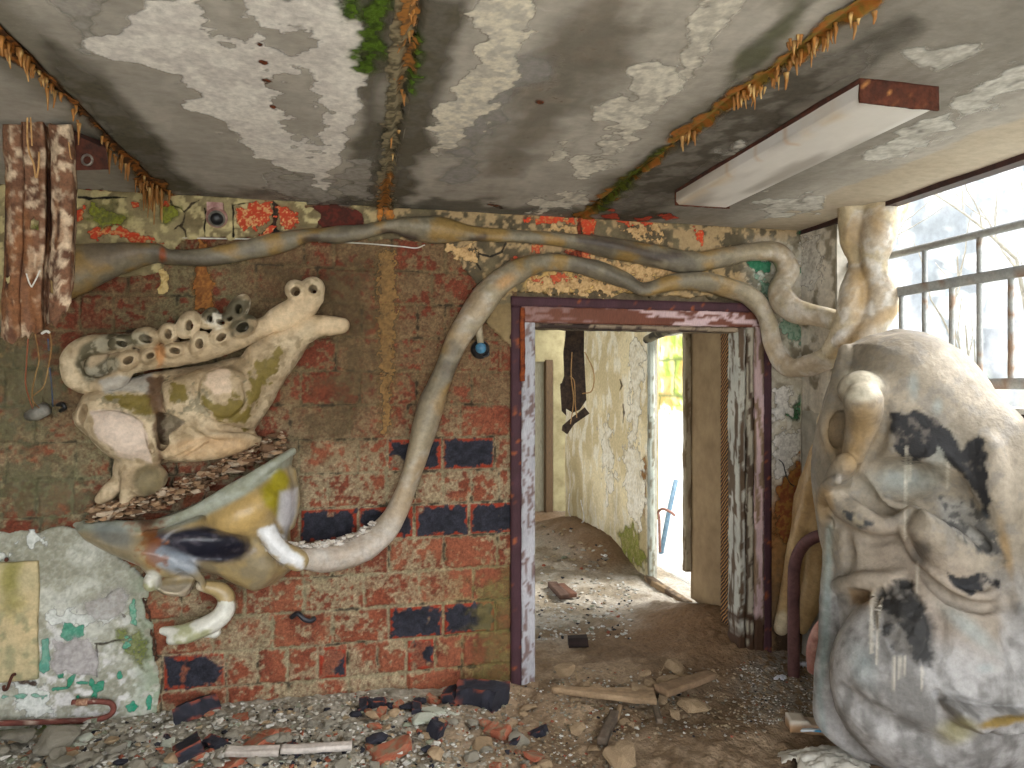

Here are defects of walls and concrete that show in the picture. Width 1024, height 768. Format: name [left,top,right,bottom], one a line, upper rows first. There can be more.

crack [170,200,206,237]
peeling [50,0,379,250]
damp [335,0,573,215]
damp [493,14,623,174]
spalling [0,238,478,560]
spalling [122,321,510,713]
peeling [601,337,647,532]
peeling [772,386,801,479]
rust [772,451,801,548]
peeling [1,607,114,719]